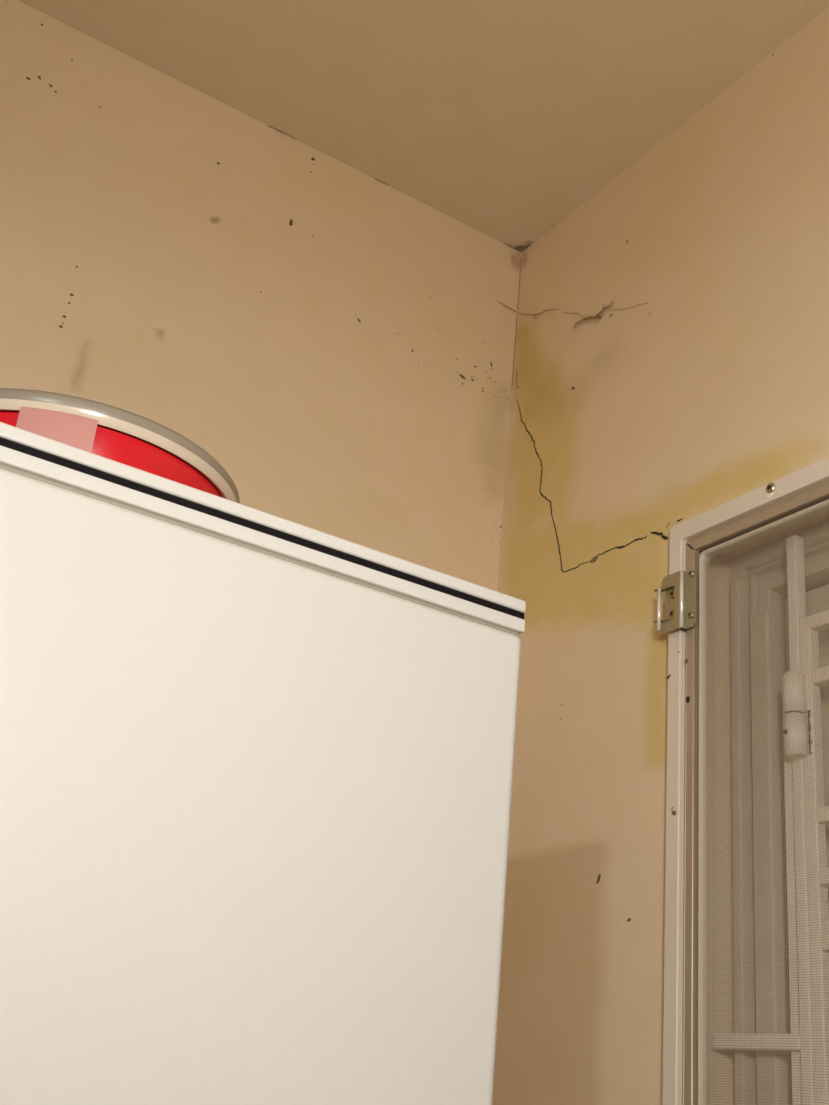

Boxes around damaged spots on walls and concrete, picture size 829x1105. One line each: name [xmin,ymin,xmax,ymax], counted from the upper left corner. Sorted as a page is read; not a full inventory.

crack [512,266,682,572]